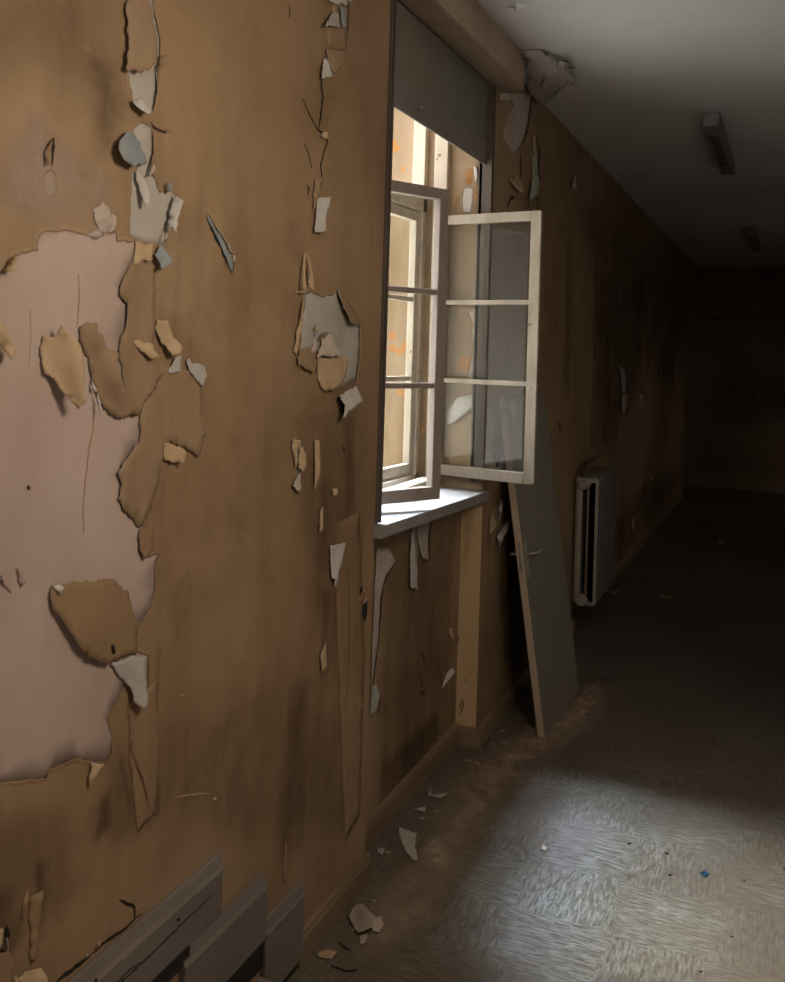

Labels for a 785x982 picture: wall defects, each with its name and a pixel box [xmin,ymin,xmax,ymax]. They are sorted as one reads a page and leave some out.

peeling [322,0,352,79]
peeling [500,90,541,207]
peeling [203,207,236,277]
peeling [294,251,364,418]
peeling [0,0,207,789]
peeling [330,543,346,586]
peeling [359,521,432,715]
peeling [0,886,48,982]
crack [56,895,212,982]